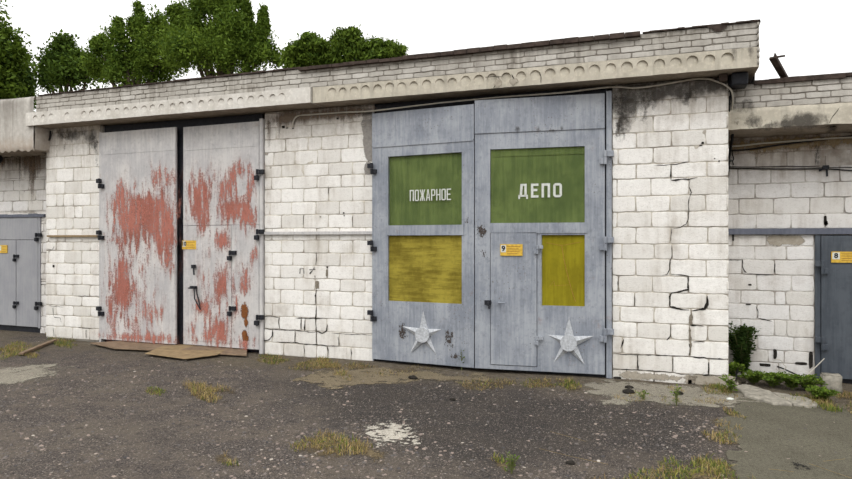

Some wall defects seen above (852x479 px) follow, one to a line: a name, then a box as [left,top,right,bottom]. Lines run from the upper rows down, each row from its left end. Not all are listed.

water stain [612,77,729,130]
water stain [768,114,818,128]
water stain [728,126,852,153]